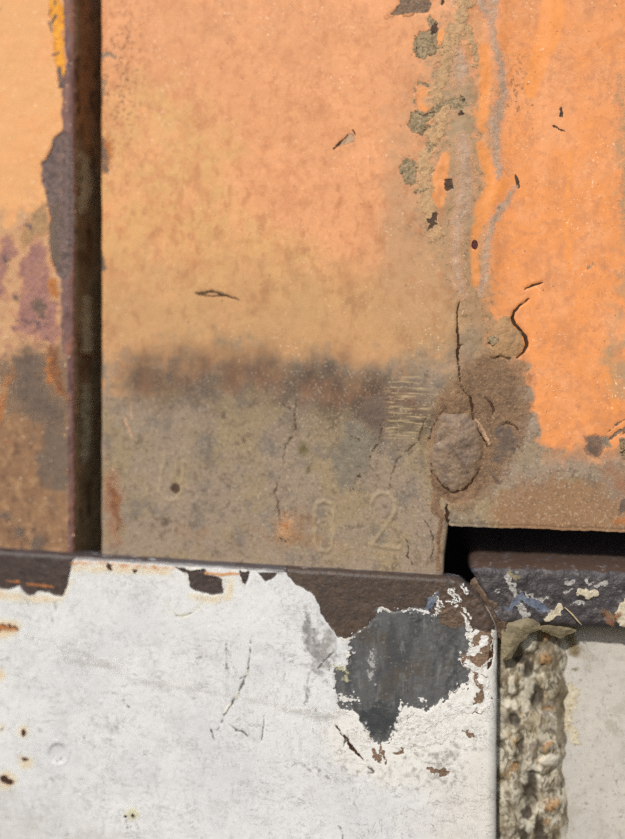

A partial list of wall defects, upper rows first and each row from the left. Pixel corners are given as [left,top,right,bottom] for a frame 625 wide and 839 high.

peeling [384,0,479,243]
peeling [20,130,94,297]
corrosion [0,235,70,400]
crack [456,302,519,430]
crack [493,282,543,360]
corrosion [0,622,18,635]
peeling [0,549,75,600]
crack [210,642,264,741]
peeling [175,566,496,765]
peeling [494,571,608,622]
corrosion [0,775,14,786]
crack [335,725,374,773]